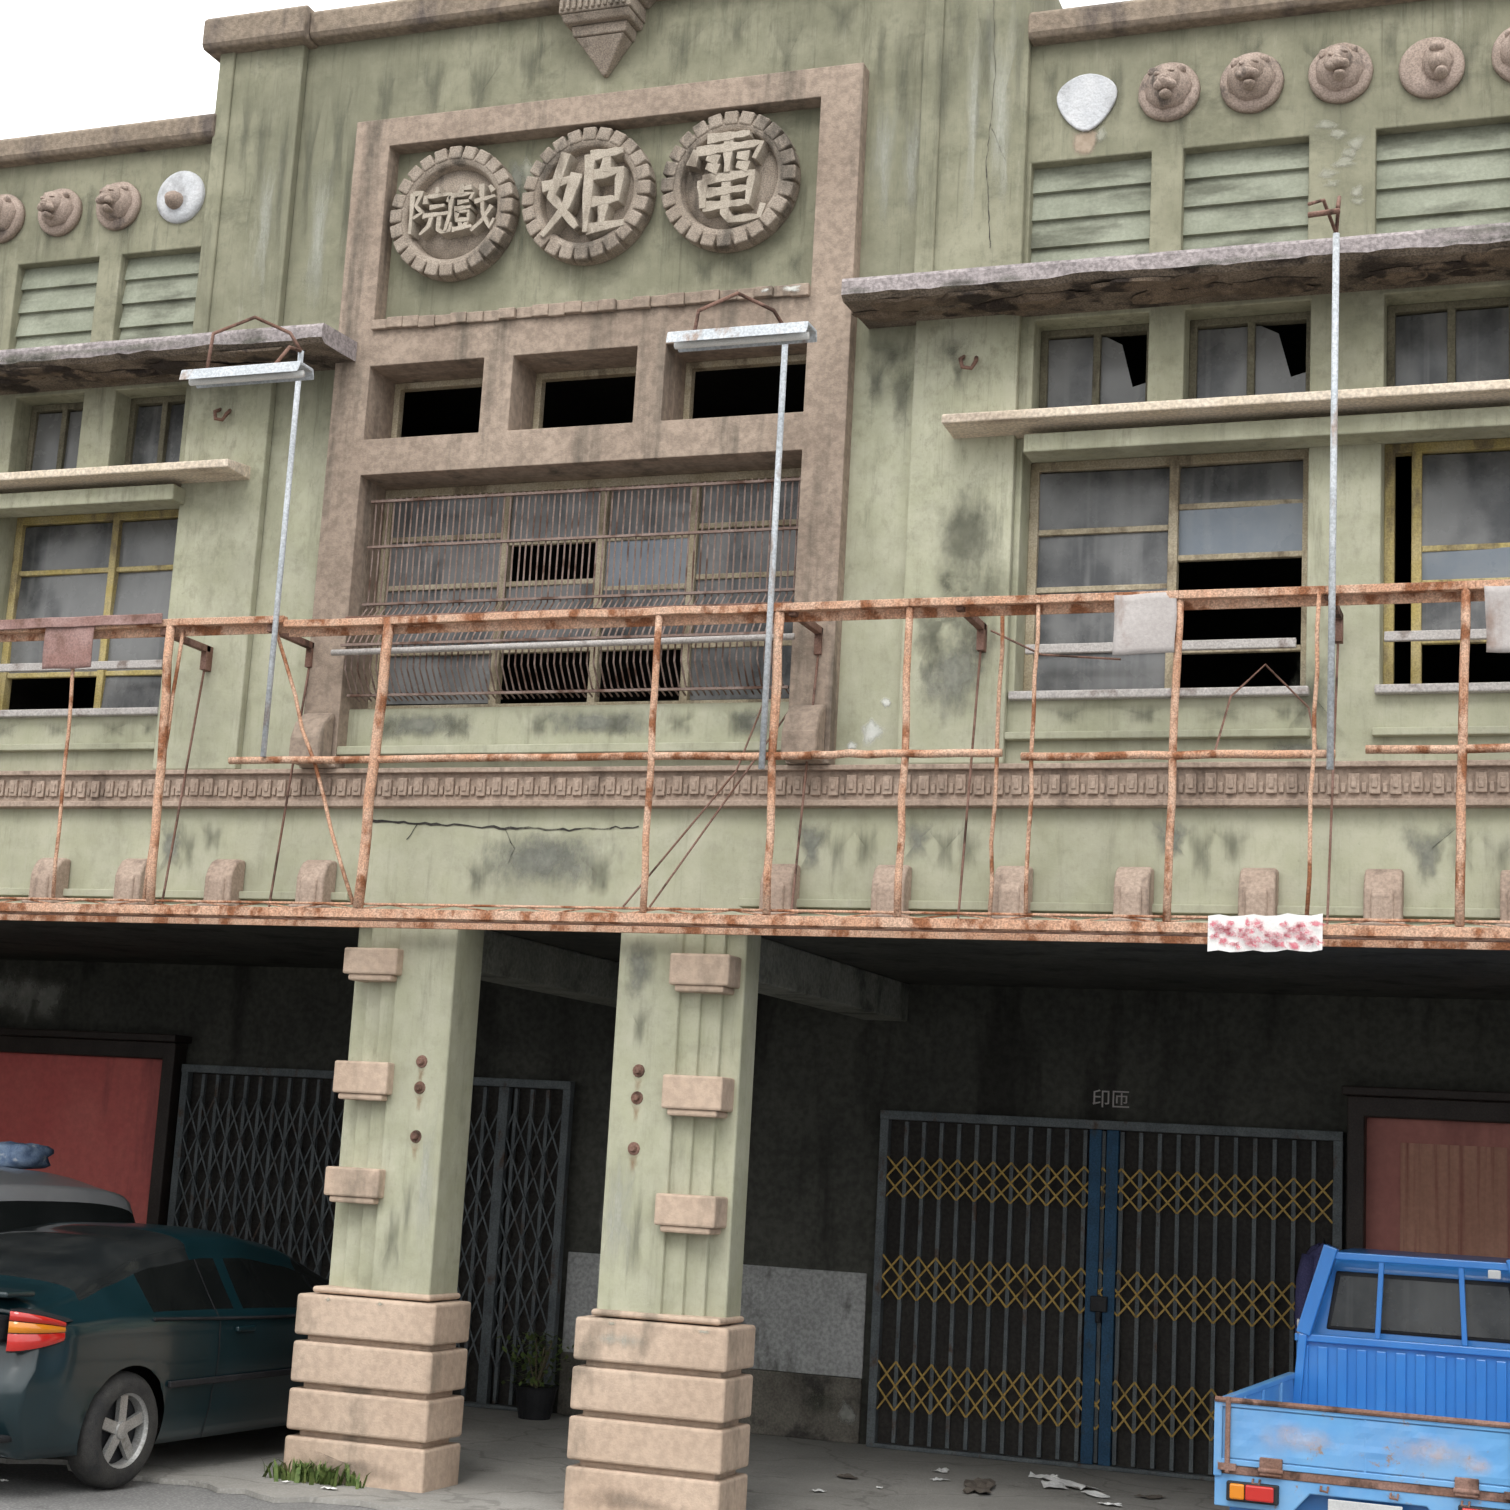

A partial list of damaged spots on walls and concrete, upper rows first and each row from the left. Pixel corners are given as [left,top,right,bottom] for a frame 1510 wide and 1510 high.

crack [985,0,1001,248]
spalling [1364,235,1510,286]
spalling [852,258,1323,322]
spalling [0,338,306,390]
damp [951,511,981,556]
crack [373,819,639,863]
damp [502,843,588,880]